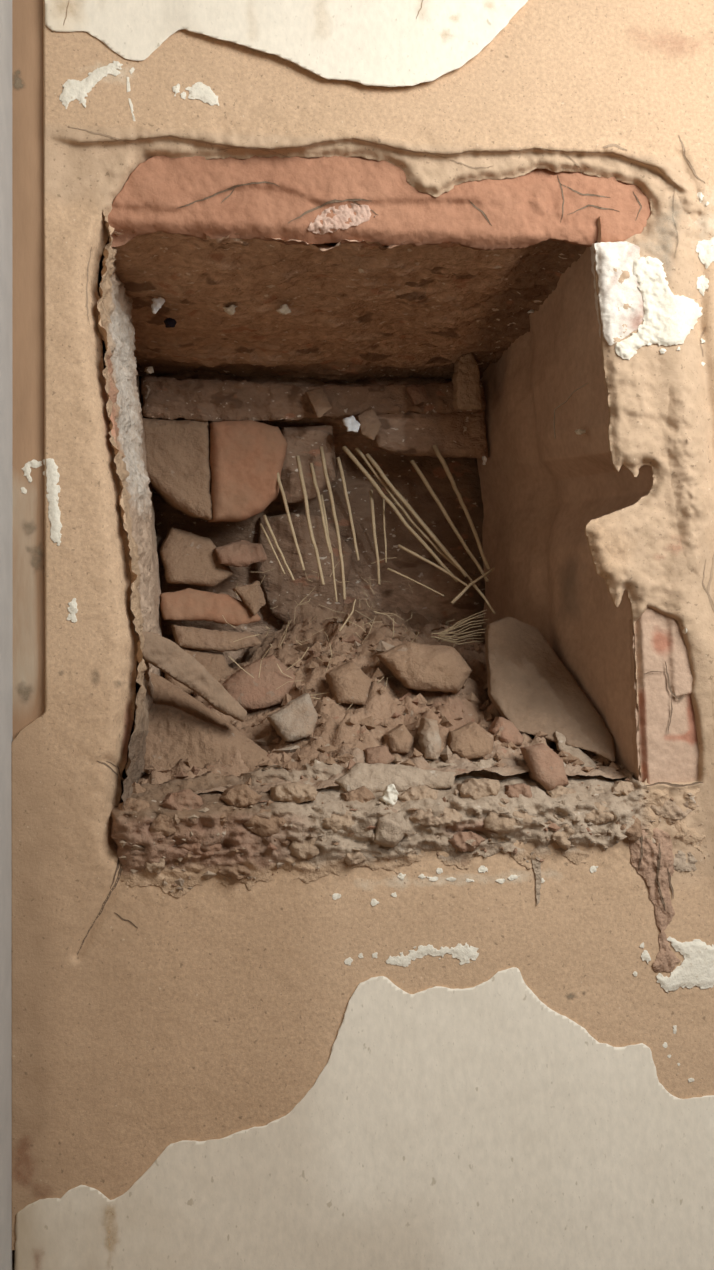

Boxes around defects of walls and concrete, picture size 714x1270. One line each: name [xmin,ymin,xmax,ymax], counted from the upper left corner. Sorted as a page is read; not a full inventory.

crack [68,126,705,255]
spalling [97,155,706,898]
spalling [531,856,542,906]
spalling [629,827,681,972]